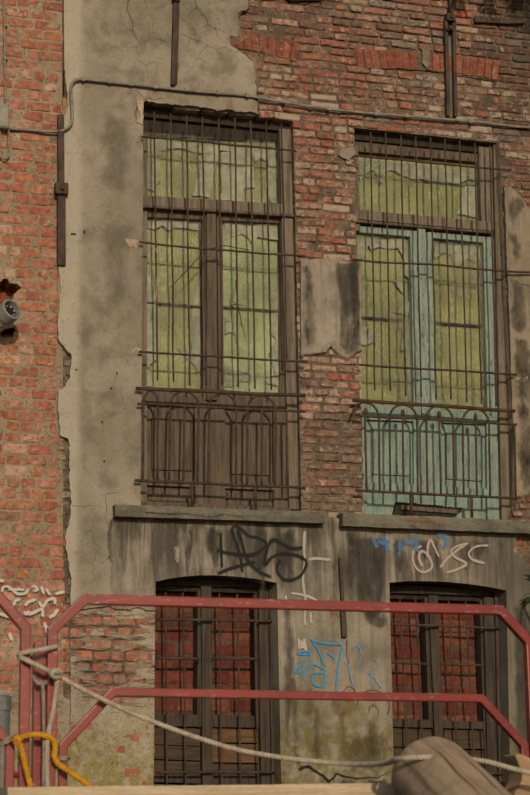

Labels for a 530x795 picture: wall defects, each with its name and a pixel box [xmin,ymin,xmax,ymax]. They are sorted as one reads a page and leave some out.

crack [127,0,226,82]
flaking render [230,0,261,115]
hole [0,278,22,304]
leakage [338,264,358,321]
crack [298,764,392,783]